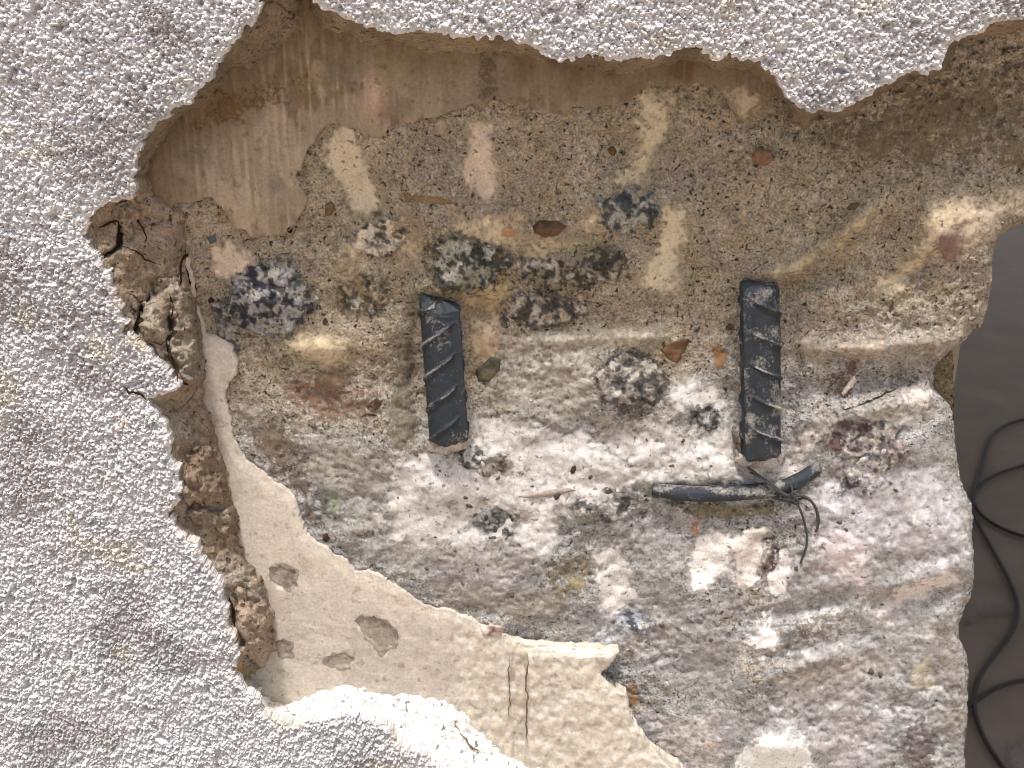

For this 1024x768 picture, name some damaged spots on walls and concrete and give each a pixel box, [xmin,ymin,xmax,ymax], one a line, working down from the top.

spalling [86,0,301,334]
peeling [146,0,776,238]
crack [98,219,207,385]
spalling [175,30,1024,768]
crack [507,657,529,742]